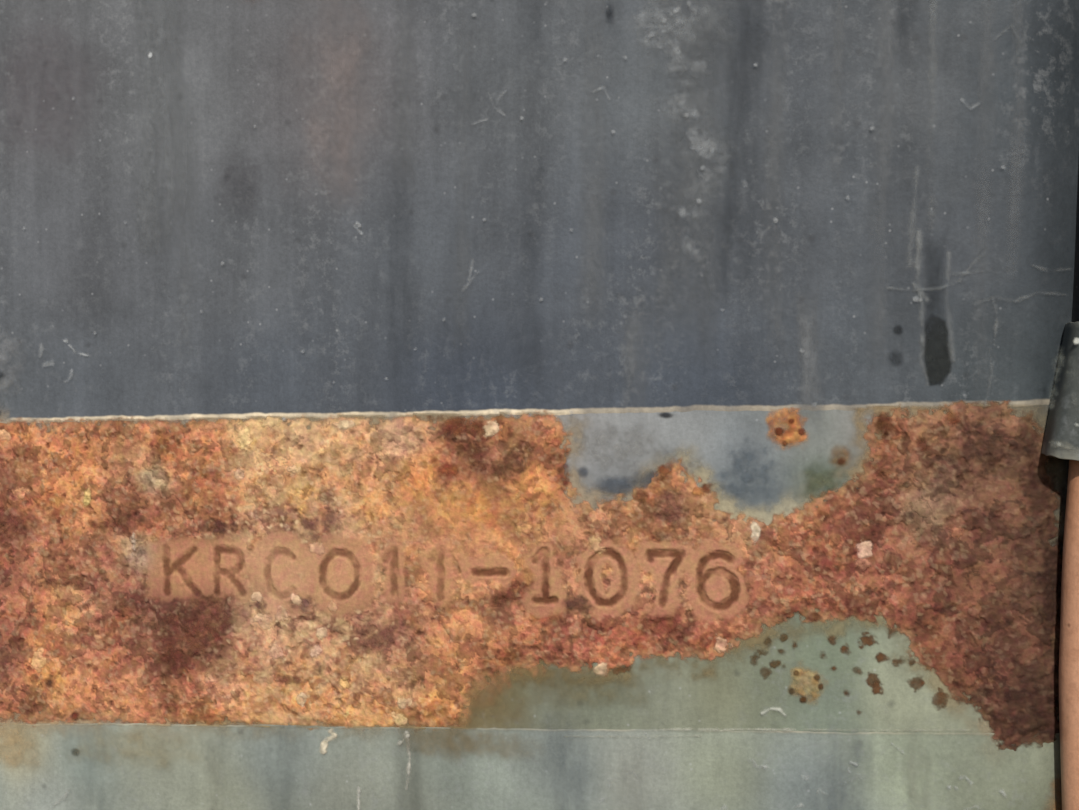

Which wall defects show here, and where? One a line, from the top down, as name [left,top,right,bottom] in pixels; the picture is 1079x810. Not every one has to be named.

water stain [923,267,952,384]
rust [0,400,1063,751]